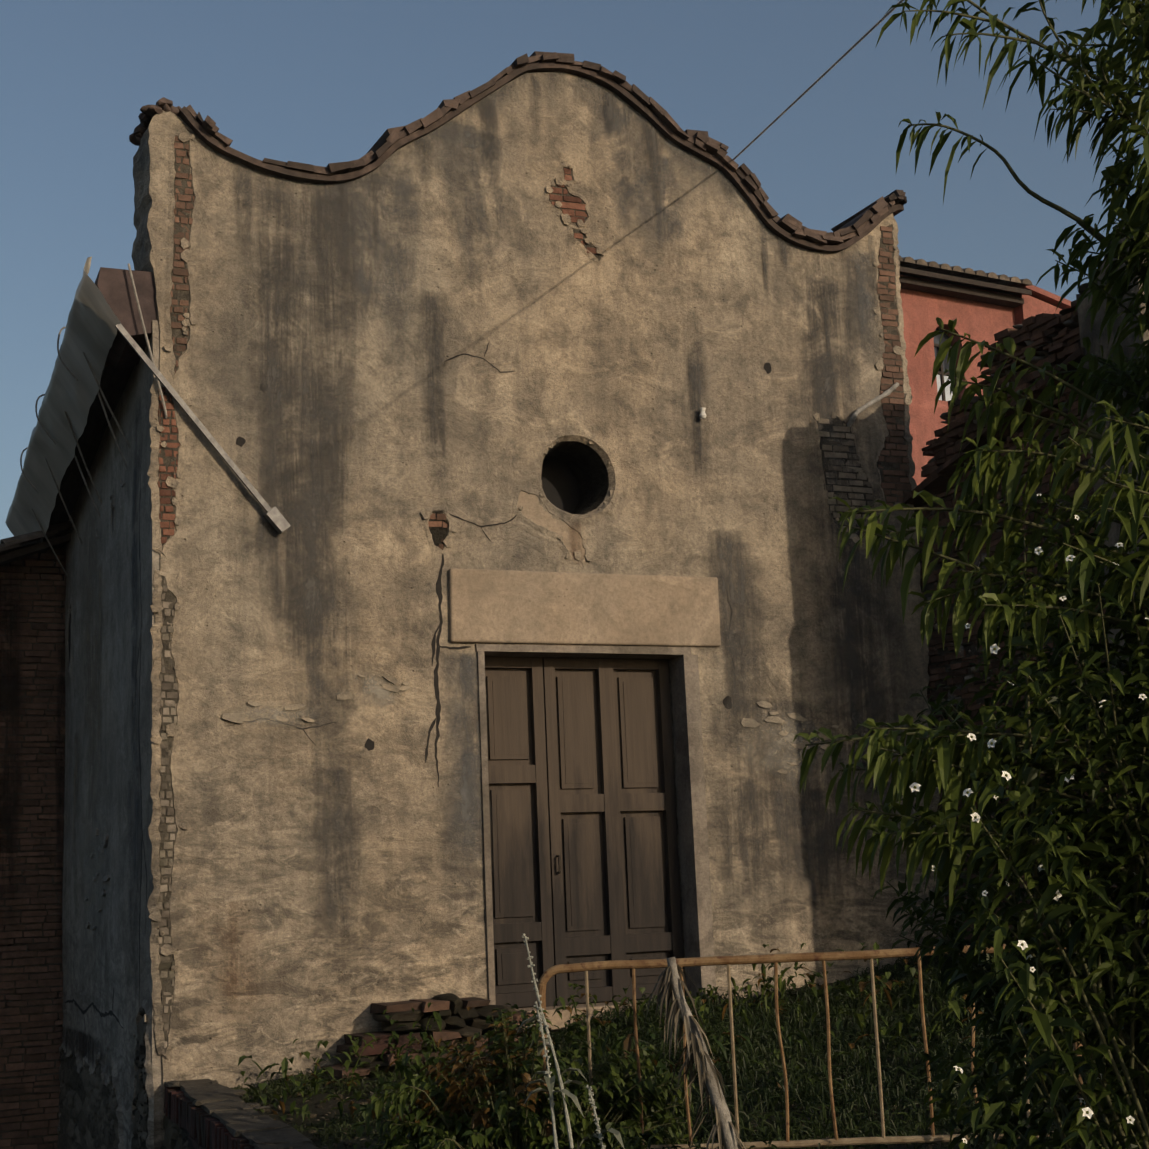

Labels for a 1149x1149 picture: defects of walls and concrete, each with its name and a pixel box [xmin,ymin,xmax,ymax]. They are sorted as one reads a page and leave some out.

crack [65,990,124,1035]
flaking render [131,570,189,1149]
flaking render [147,130,201,557]
damp [255,156,413,727]
flaking render [420,505,458,555]
crack [424,554,471,787]
flaking render [542,162,608,266]
damp [578,76,730,233]
damp [712,534,848,890]
damp [805,252,888,748]
flaking render [812,221,917,550]